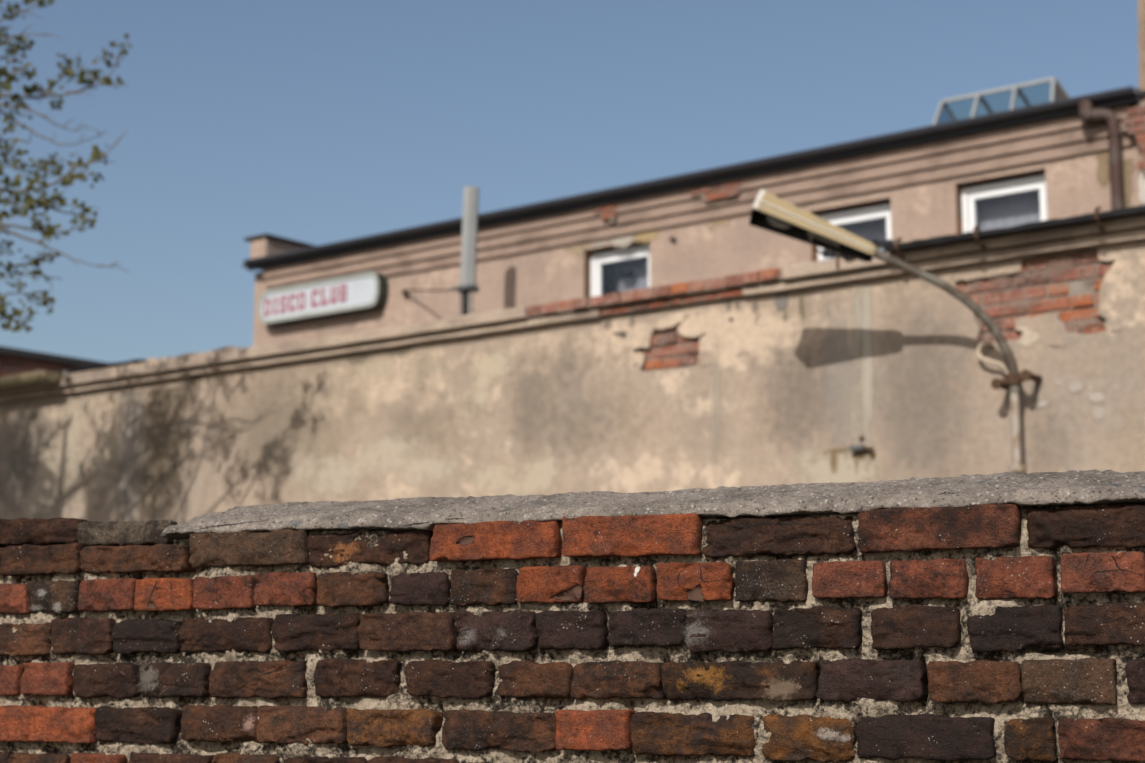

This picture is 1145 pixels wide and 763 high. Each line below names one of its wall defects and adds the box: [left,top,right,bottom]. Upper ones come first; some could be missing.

spalling [1095,101,1145,208]
spalling [633,322,704,372]
spalling [775,293,788,311]
spalling [954,248,1115,344]